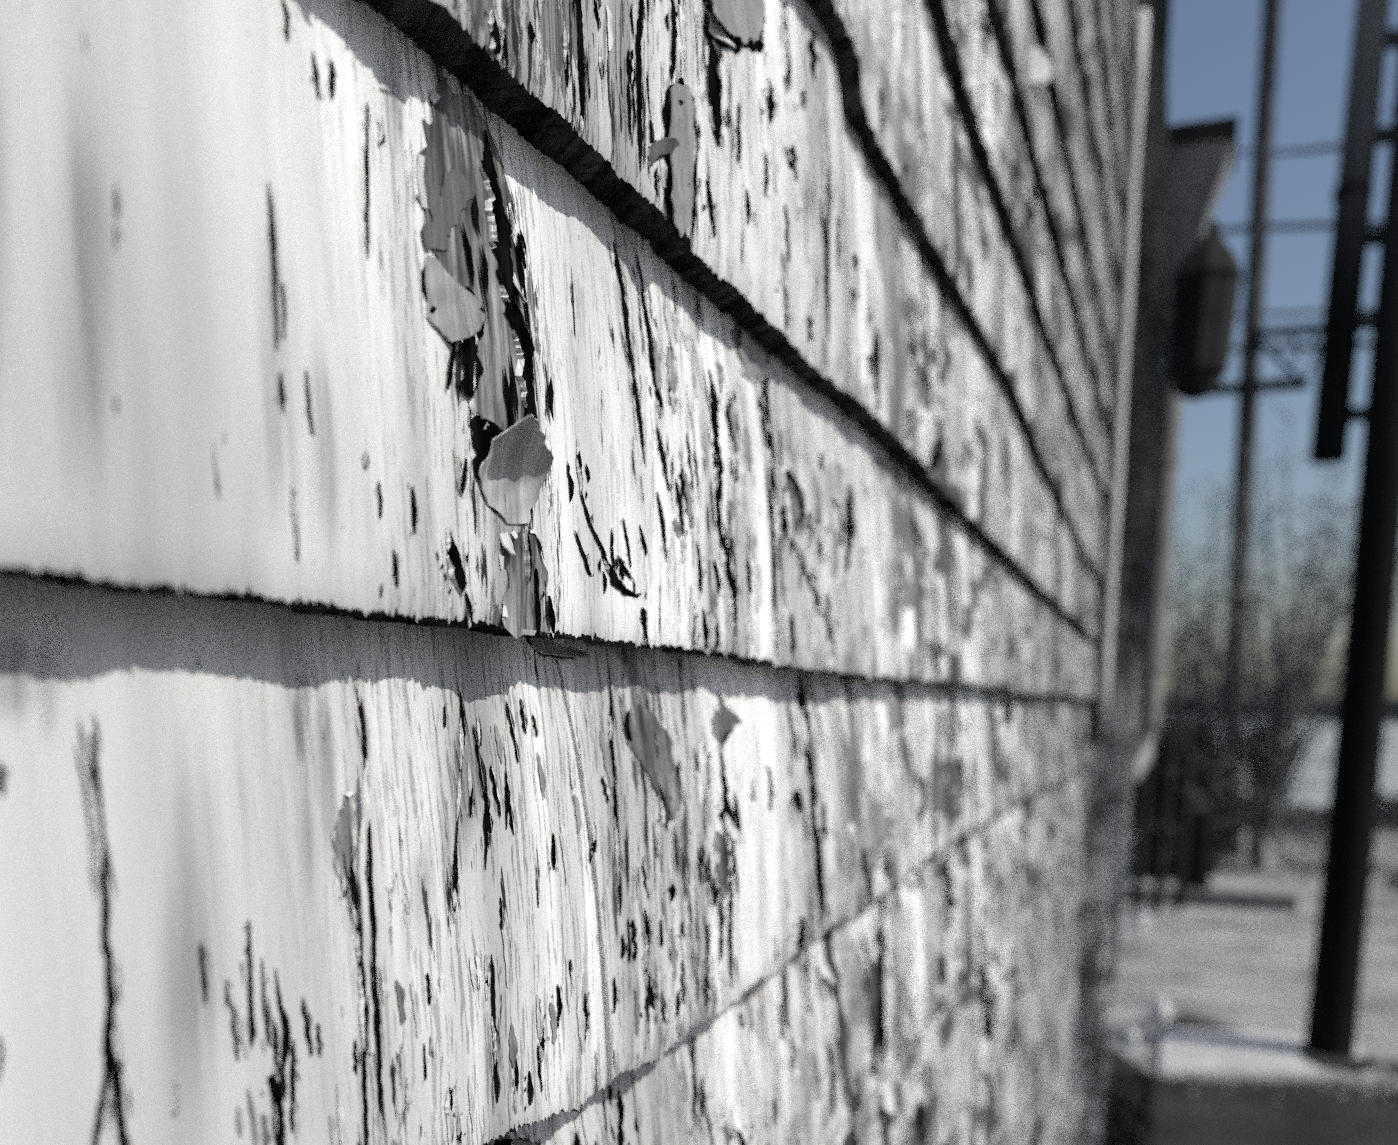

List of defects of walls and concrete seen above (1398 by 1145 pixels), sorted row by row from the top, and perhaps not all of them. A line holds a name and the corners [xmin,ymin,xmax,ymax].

peeling [595,0,613,51]
peeling [648,0,766,239]
peeling [416,76,590,659]
peeling [774,433,900,603]
peeling [302,995,324,1057]
peeling [332,758,432,1074]
peeling [473,698,546,835]
peeling [635,928,729,1050]
peeling [626,691,742,832]
peeling [702,813,745,943]
peeling [778,895,916,1145]
peeling [887,688,1031,955]